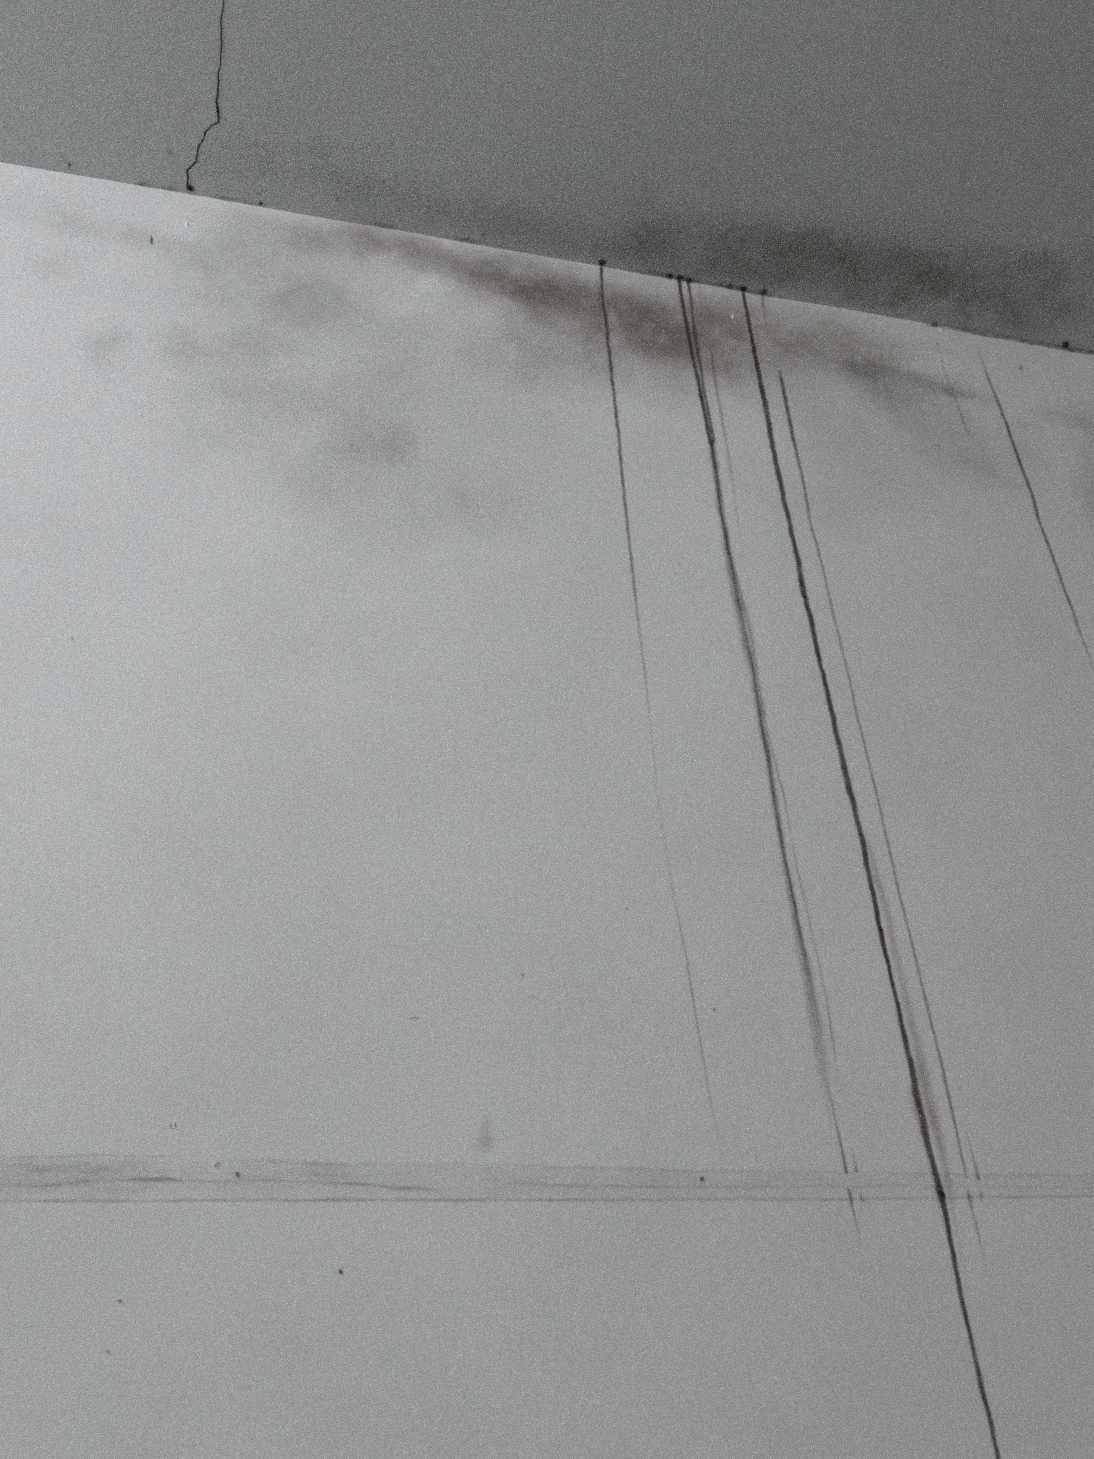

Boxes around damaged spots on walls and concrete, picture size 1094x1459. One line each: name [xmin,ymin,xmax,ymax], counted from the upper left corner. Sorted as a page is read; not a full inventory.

crack [186,0,224,191]
water stain [599,260,627,515]
water stain [667,274,731,569]
water stain [728,285,1000,1459]